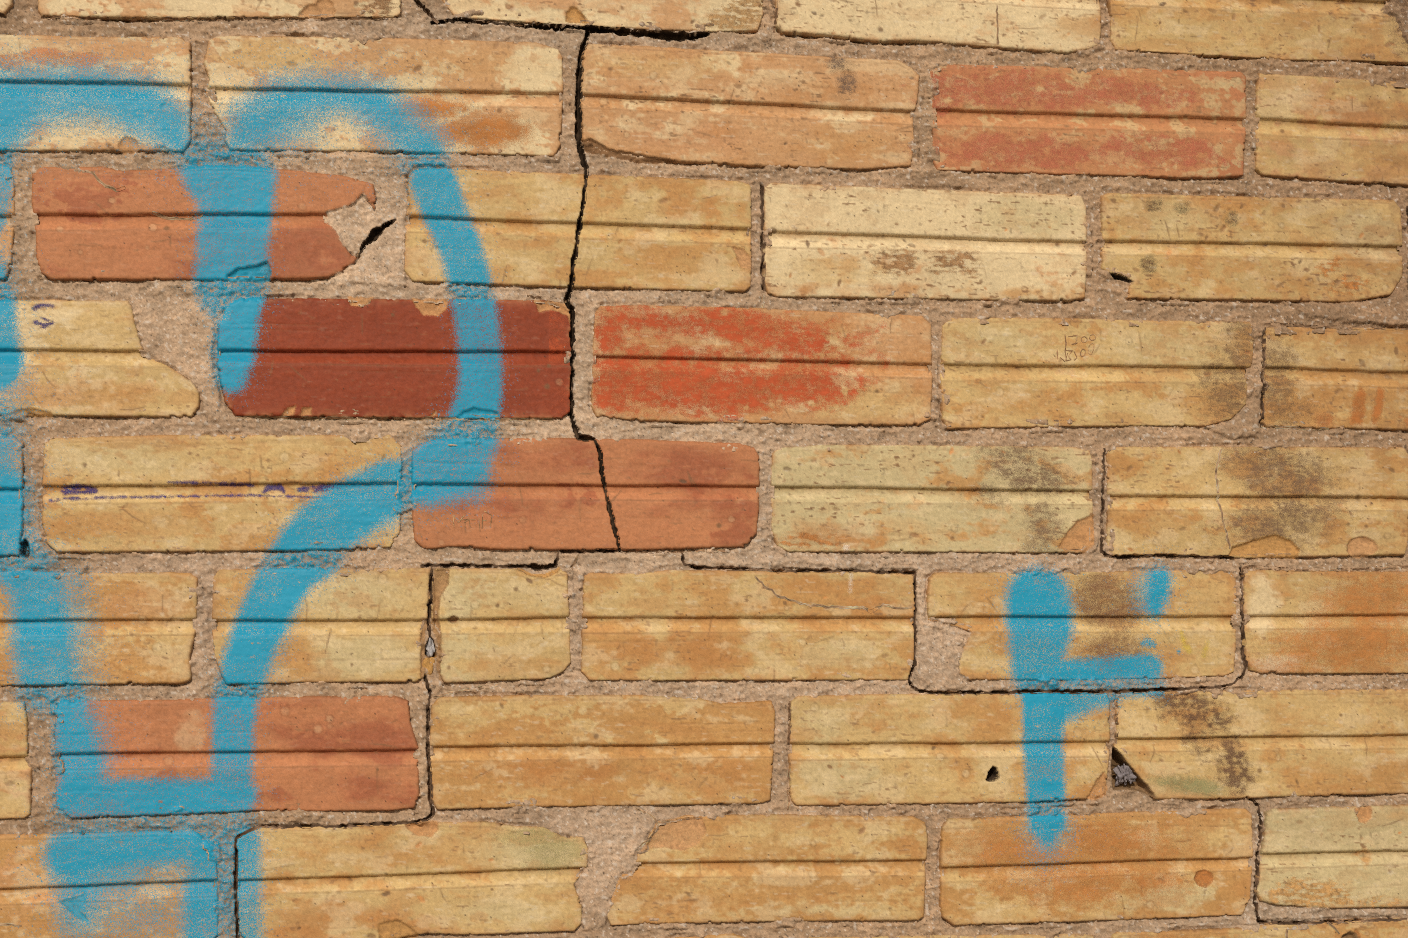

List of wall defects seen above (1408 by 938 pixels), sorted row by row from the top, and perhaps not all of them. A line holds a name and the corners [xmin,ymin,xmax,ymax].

crack [41,0,1408,743]
crack [785,701,793,810]
spalling [1087,744,1157,801]
crack [635,808,671,852]